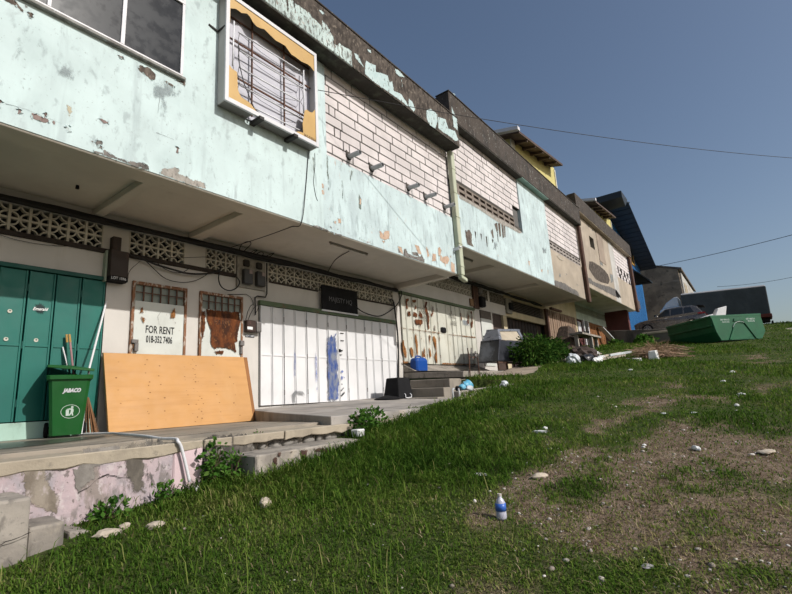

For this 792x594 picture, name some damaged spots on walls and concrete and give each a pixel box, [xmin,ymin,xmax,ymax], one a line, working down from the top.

peeling [138,65,186,88]
peeling [354,50,415,111]
peeling [426,109,458,141]
spalling [92,139,149,170]
spalling [159,167,206,189]
spalling [459,196,522,238]
spalling [397,244,455,273]
rust [201,309,240,354]
spalling [21,470,60,514]
peeling [73,462,112,494]